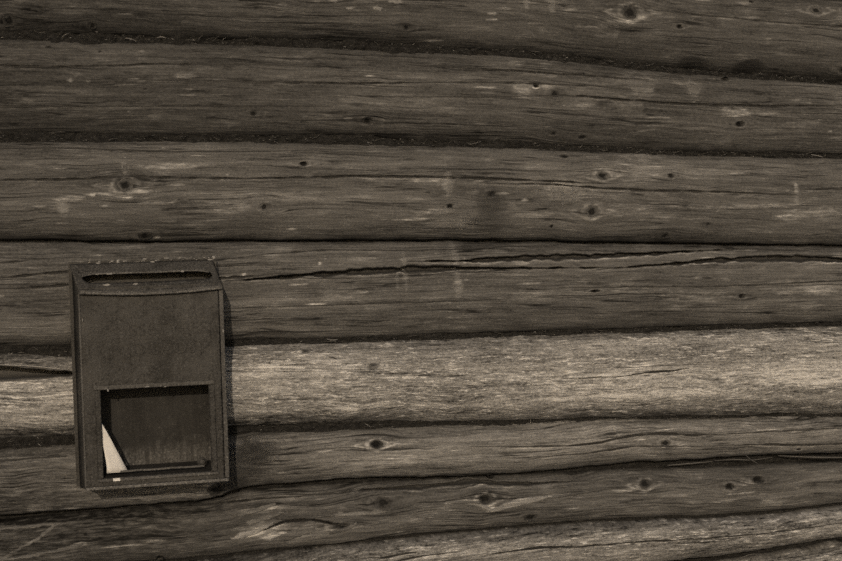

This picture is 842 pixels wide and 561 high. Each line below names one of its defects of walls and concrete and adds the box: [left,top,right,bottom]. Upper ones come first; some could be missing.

crack [0,258,69,289]
crack [216,244,842,288]
crack [192,478,592,505]
crack [262,518,347,531]
crack [484,523,840,556]
crack [369,551,460,561]